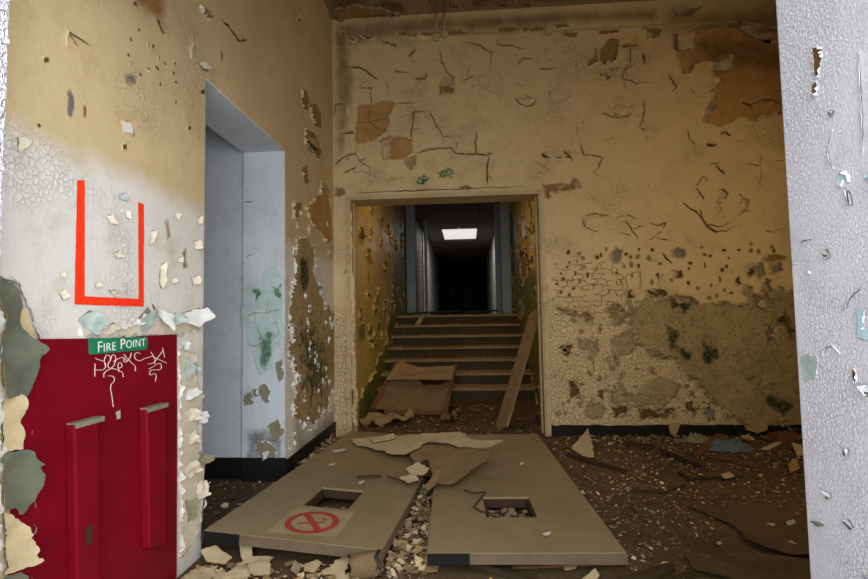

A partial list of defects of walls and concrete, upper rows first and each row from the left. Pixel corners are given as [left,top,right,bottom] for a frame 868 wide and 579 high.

peeling [0,272,49,579]
peeling [78,301,271,576]
peeling [241,88,348,461]
crack [333,39,573,426]
crack [550,213,687,315]
crack [534,41,707,189]
water stain [668,327,691,359]
peeling [553,241,818,458]
water stain [702,342,718,364]
peeling [670,3,783,130]
crack [682,127,784,222]
water stain [767,395,791,414]